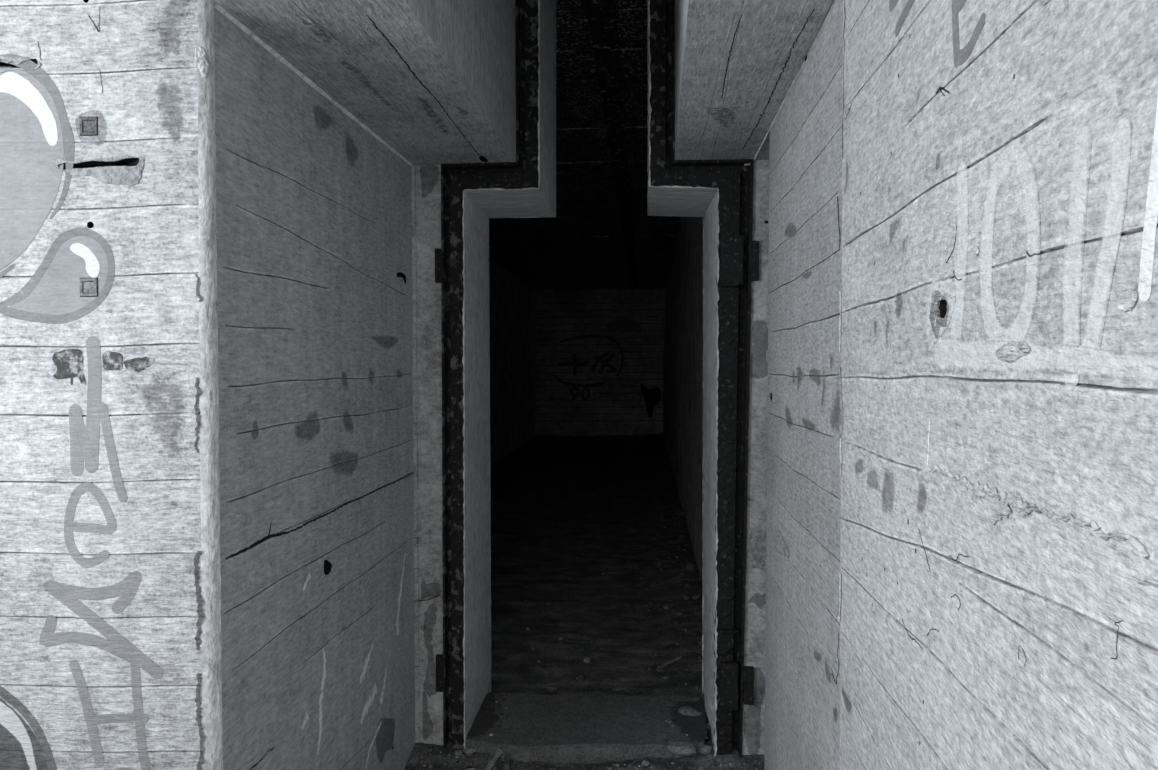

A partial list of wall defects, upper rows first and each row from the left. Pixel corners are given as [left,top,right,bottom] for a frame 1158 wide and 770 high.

leakage [151,0,195,144]
crack [365,14,480,156]
crack [226,472,414,560]